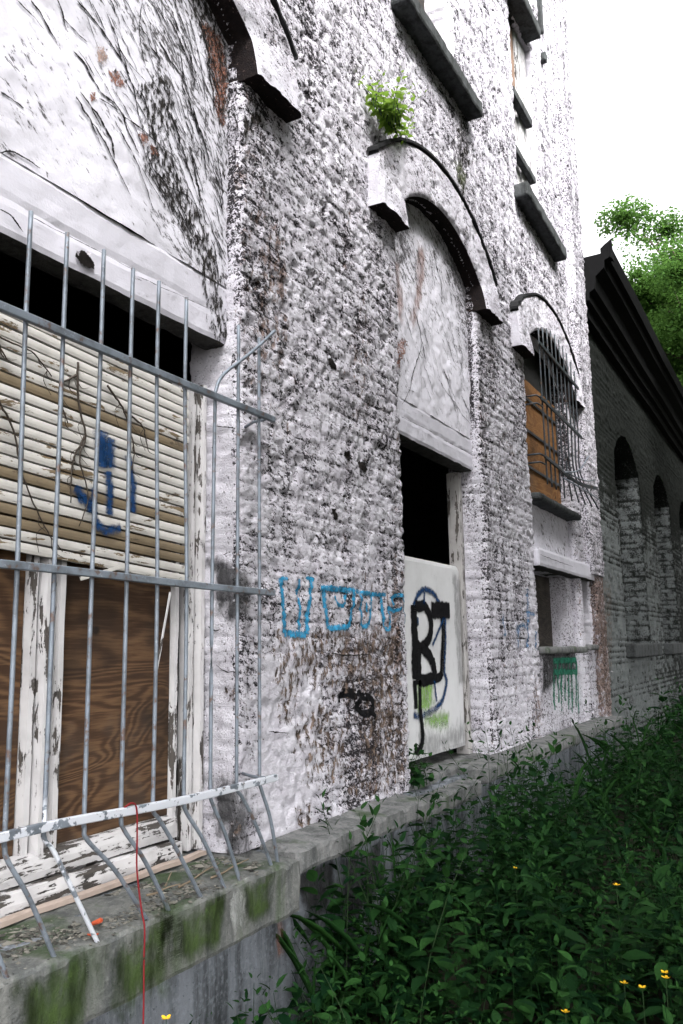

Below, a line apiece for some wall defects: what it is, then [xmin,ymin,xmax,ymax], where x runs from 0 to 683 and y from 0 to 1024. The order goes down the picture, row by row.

crack [1,150,40,168]
crack [17,0,213,277]
leakage [245,872,275,920]
leakage [105,894,225,1005]
leakage [15,958,88,1024]